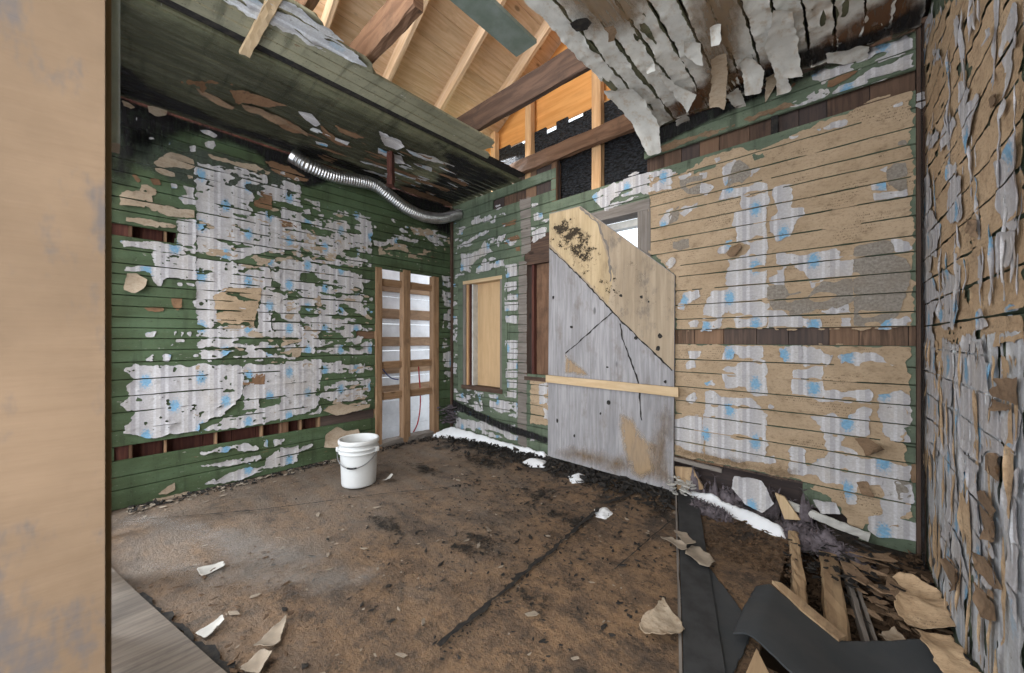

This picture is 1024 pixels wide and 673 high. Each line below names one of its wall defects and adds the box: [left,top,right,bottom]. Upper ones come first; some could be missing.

peeling [181,80,468,206]
peeling [126,439,337,518]
peeling [119,161,549,447]
peeling [524,0,1024,673]